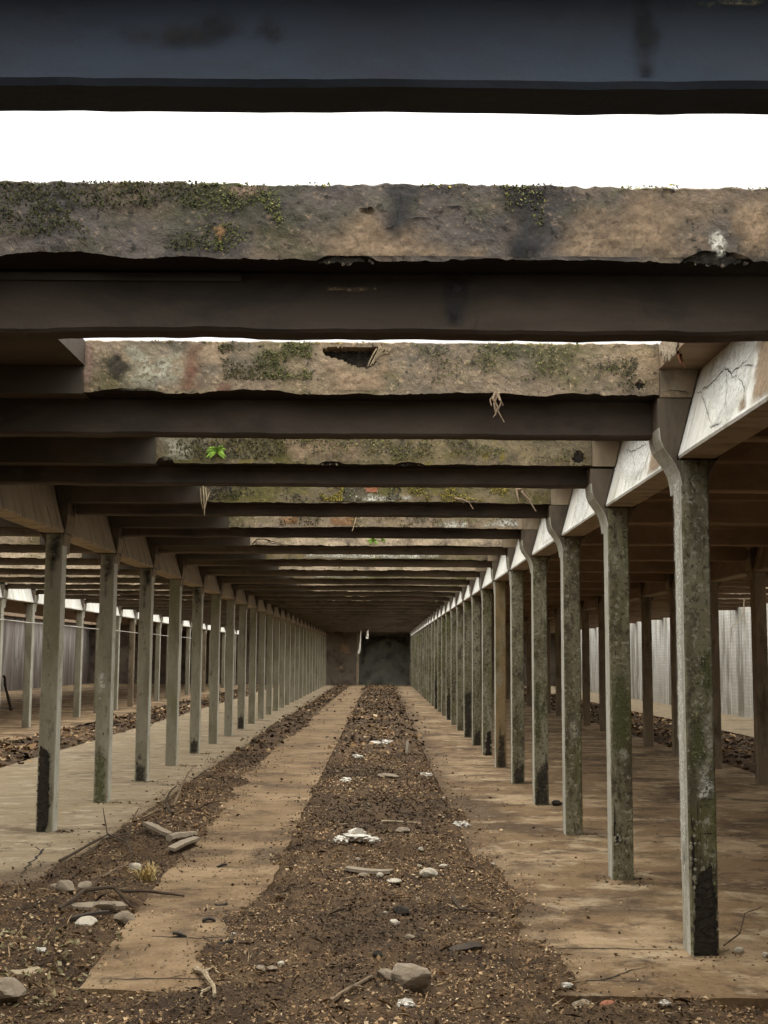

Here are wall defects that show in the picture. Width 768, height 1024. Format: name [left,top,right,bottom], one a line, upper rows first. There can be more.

efflorescence [709,231,725,252]
peeling [679,202,768,268]
damp [107,355,129,377]
peeling [325,348,391,390]
crack [667,356,752,428]